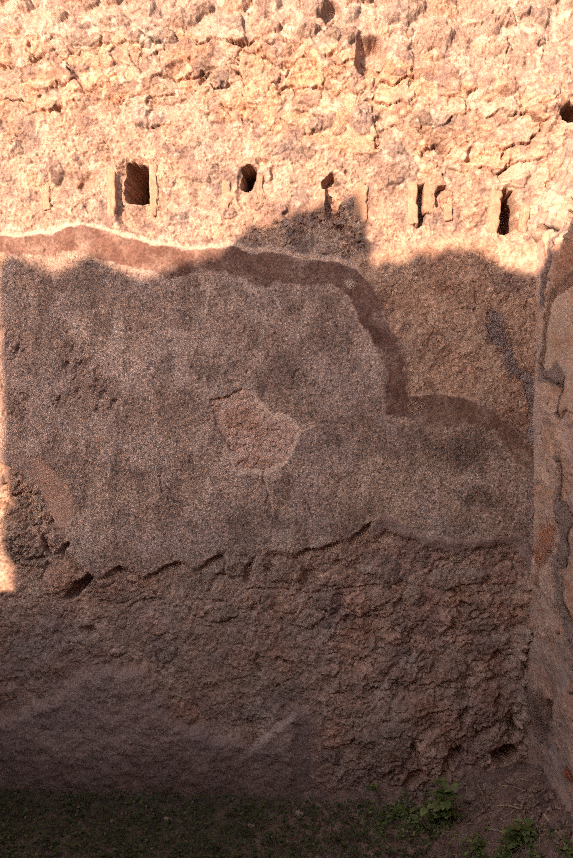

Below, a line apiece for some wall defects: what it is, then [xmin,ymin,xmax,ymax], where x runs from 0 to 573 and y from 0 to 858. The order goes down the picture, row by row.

flaking render [0,230,573,850]